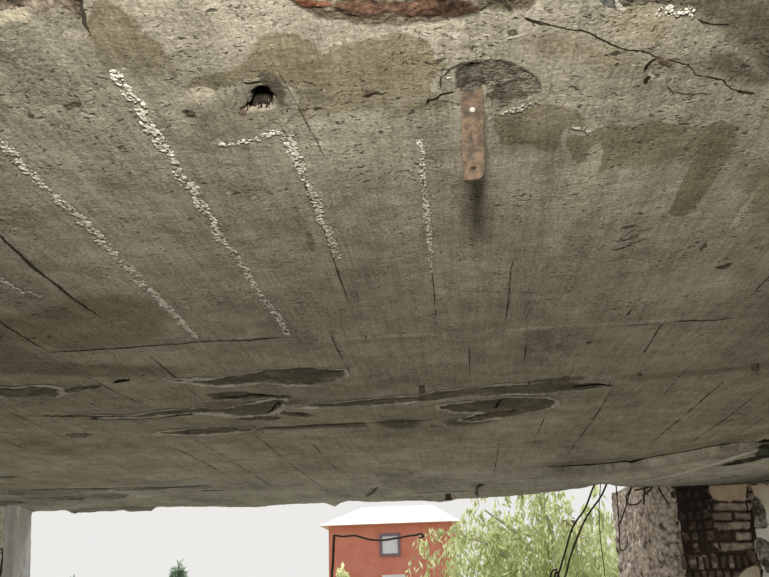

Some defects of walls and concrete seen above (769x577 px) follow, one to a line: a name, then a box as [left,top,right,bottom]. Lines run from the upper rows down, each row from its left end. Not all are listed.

spalling [0,0,83,20]
spalling [294,0,533,25]
crack [389,59,491,104]
crack [522,15,761,95]
damp [488,100,769,277]
peeling [0,385,101,399]
peeling [25,367,614,437]
spalling [671,484,769,577]